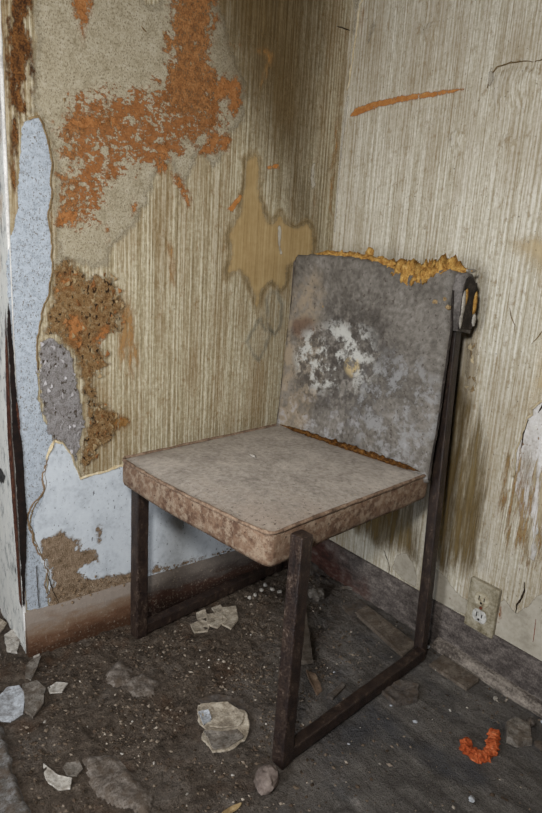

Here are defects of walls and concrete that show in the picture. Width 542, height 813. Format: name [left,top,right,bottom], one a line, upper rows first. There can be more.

rust [350,89,464,116]
crack [487,59,542,88]
peeling [6,0,245,610]
leakage [224,154,316,308]
crack [5,304,59,607]
peeling [512,400,542,560]
peeling [495,595,542,661]